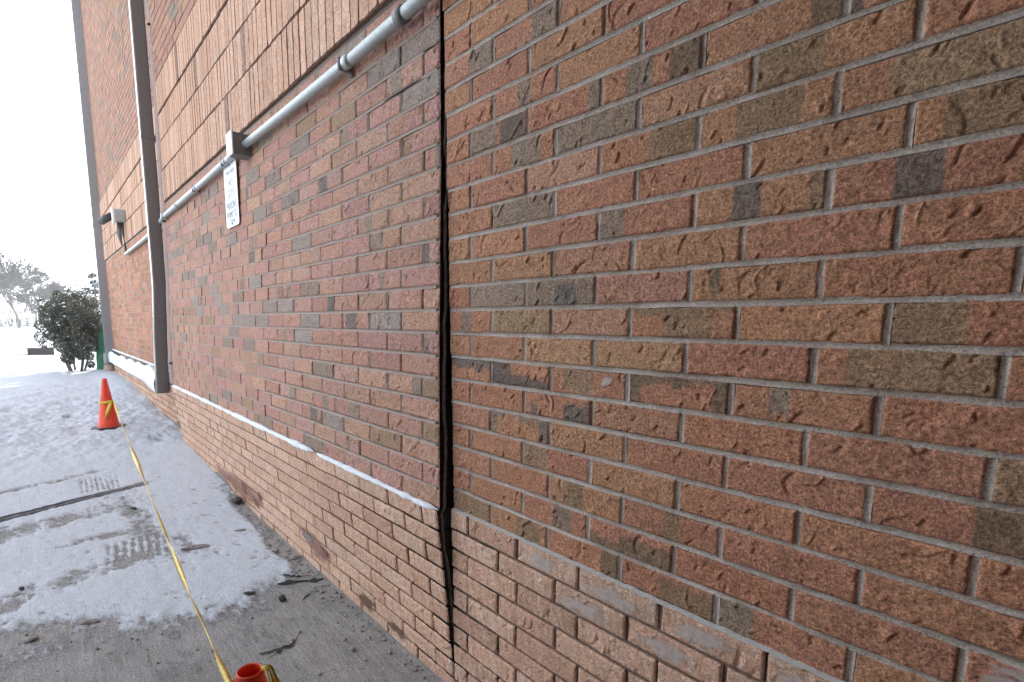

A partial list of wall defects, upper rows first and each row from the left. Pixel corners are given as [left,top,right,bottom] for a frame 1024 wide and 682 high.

crack [384,0,456,679]